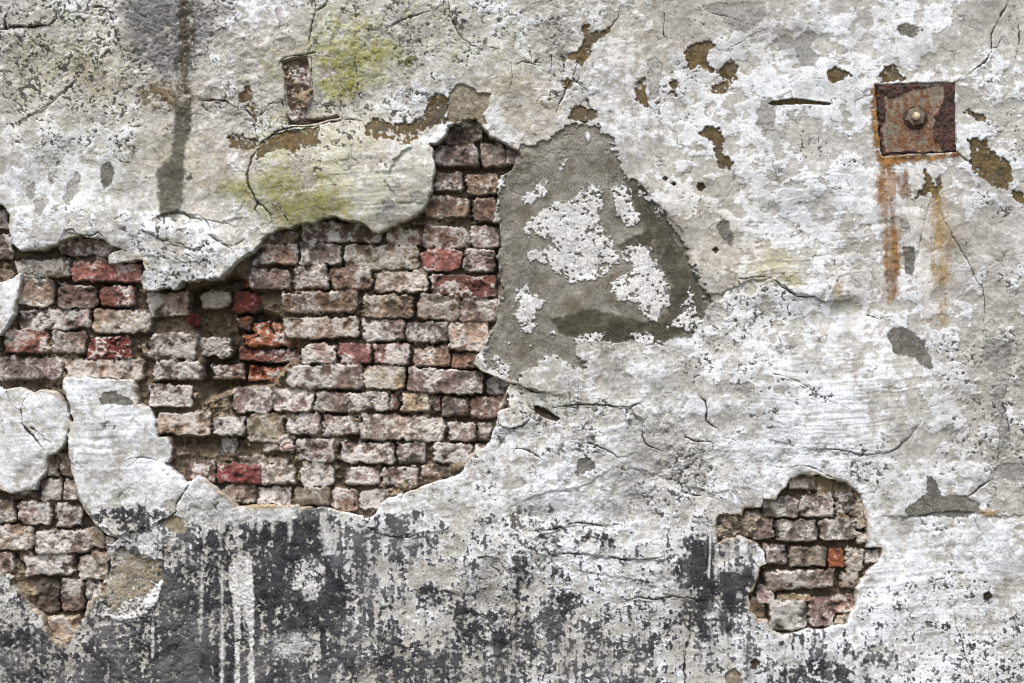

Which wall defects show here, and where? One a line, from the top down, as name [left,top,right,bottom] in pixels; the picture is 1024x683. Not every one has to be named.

water stain [125,0,206,217]
crack [203,0,362,227]
corrosion [870,85,959,299]
peeling [967,138,1024,203]
crack [6,390,50,449]
water stain [198,507,361,683]
spalling [0,84,713,644]
water stain [414,581,512,657]
crack [498,384,661,462]
water stain [671,533,755,638]
spalling [715,474,884,637]
peeling [905,476,981,517]